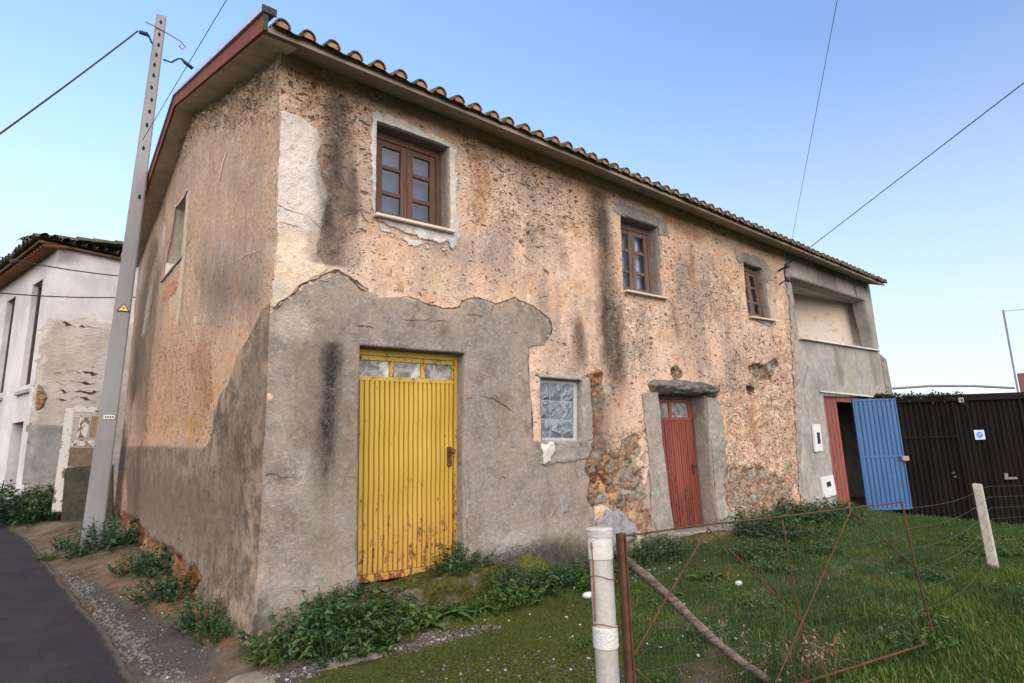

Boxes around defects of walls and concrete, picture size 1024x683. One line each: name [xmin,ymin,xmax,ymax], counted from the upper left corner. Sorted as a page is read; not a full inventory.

peeling [29,315,112,448]
spalling [112,321,202,598]
damp [320,342,339,472]
damp [318,97,358,265]
peeling [379,223,447,251]
peeling [540,441,555,464]
damp [576,321,585,357]
damp [593,190,624,388]
spalling [585,369,654,532]
spalling [746,358,779,395]